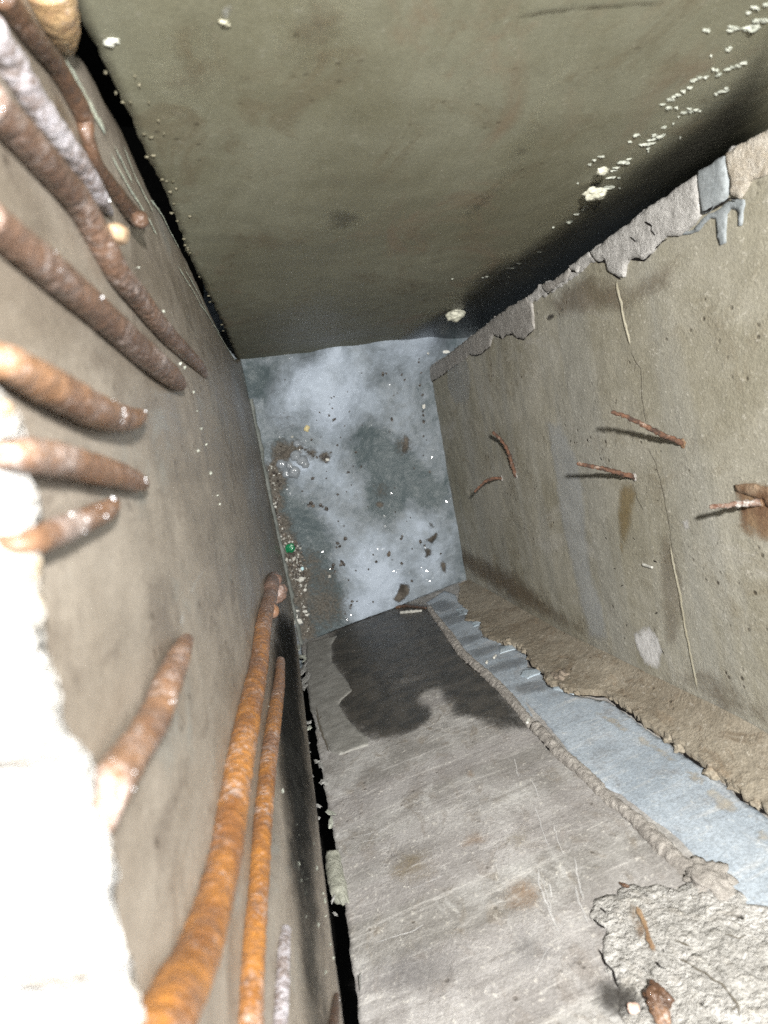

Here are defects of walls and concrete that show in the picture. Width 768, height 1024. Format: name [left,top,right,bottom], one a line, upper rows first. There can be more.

corrosion [0,0,208,392]
spalling [541,130,768,292]
corrosion [0,342,148,432]
spalling [430,297,535,381]
corrosion [0,436,150,555]
corrosion [620,487,634,537]
corrosion [736,491,768,537]
corrosion [94,633,194,834]
corrosion [141,571,291,1024]
water stain [331,604,526,738]
peeling [520,669,541,679]
spalling [589,881,768,1024]